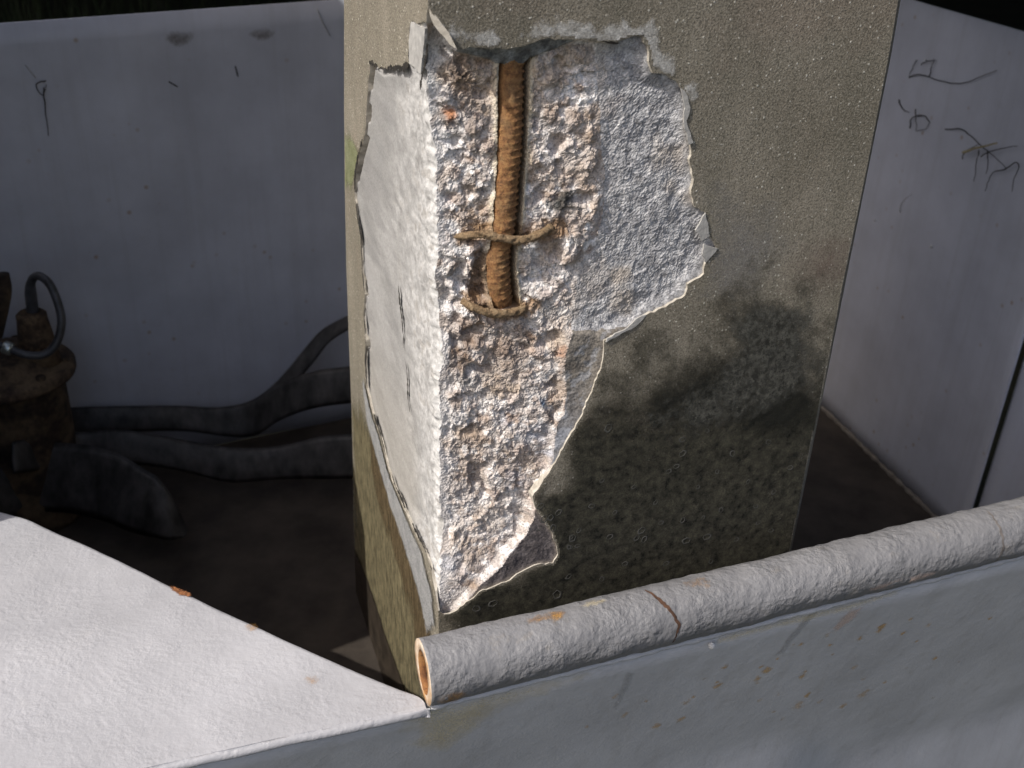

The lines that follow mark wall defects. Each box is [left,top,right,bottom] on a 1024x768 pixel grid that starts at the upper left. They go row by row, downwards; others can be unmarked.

spalling [357,9,718,613]
crack [645,590,681,643]